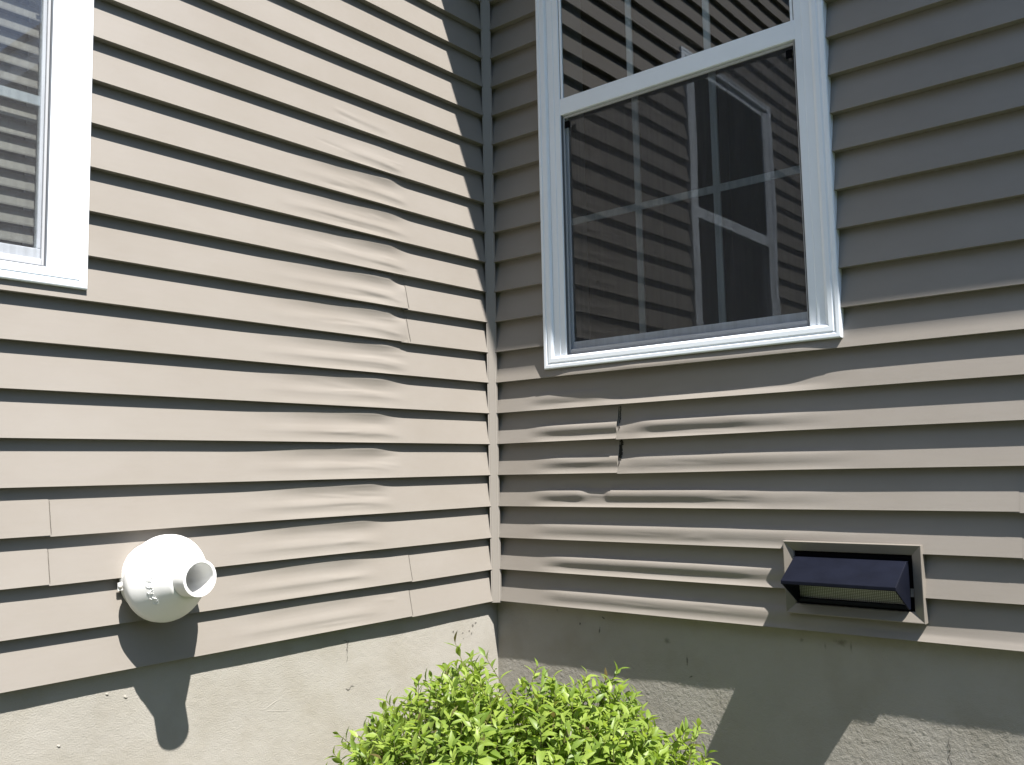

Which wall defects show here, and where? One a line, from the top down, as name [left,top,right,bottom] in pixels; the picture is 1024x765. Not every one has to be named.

crack [617,406,625,466]